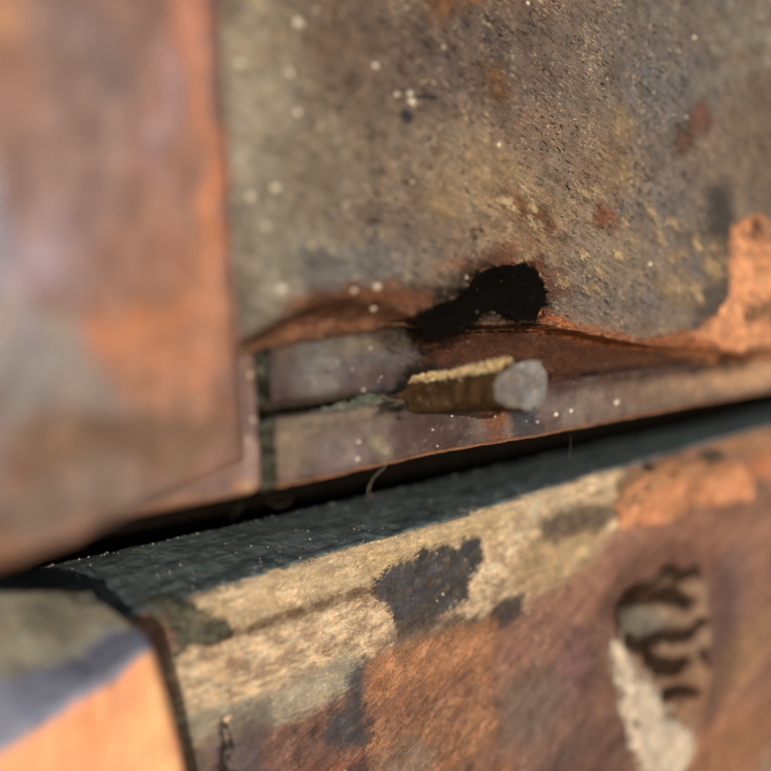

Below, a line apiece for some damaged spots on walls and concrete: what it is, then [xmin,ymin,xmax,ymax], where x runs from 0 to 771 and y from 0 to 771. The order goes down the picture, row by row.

spalling [524,210,771,366]
leakage [370,535,523,654]
peeling [161,448,767,771]
crack [220,720,235,771]